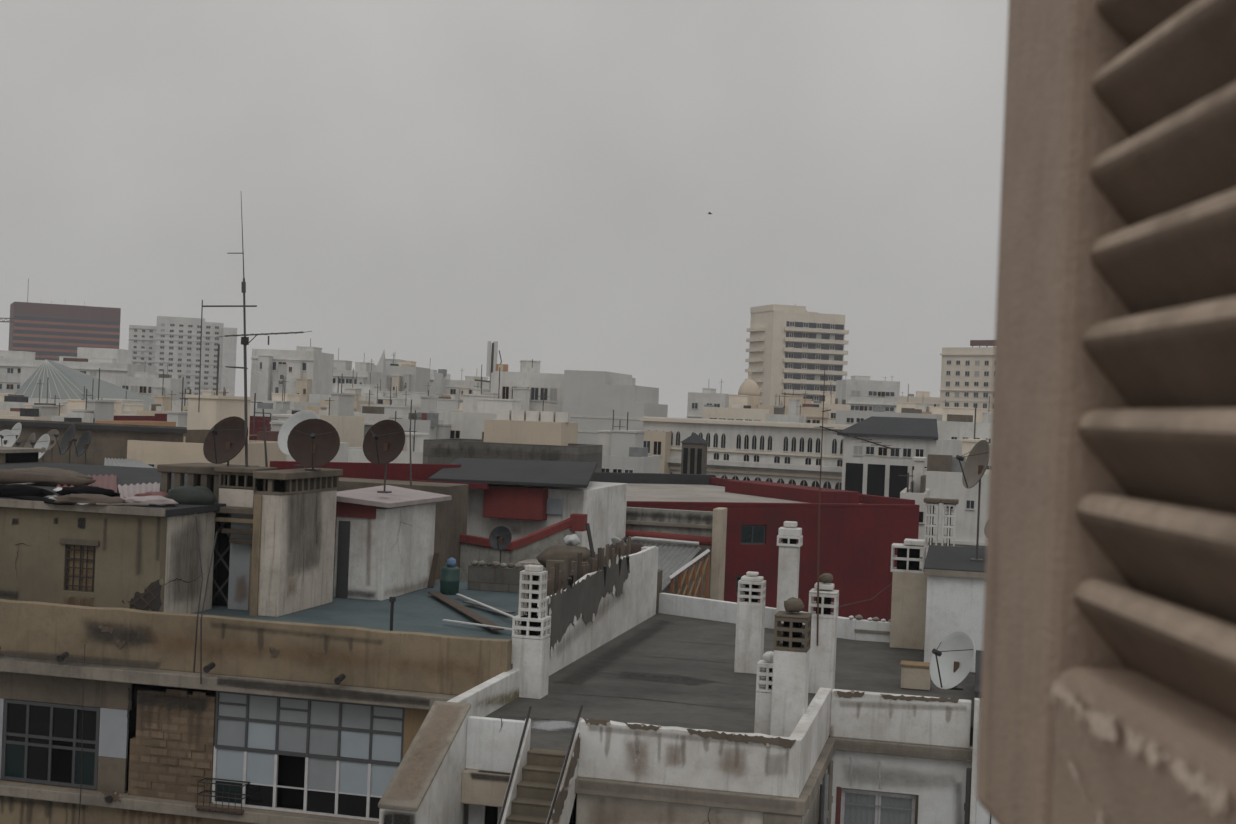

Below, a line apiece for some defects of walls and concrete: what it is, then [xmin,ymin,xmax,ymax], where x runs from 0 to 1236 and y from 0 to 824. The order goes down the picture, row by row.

spalling [122,578,164,612]
peeling [548,554,630,657]
peeling [687,729,796,749]